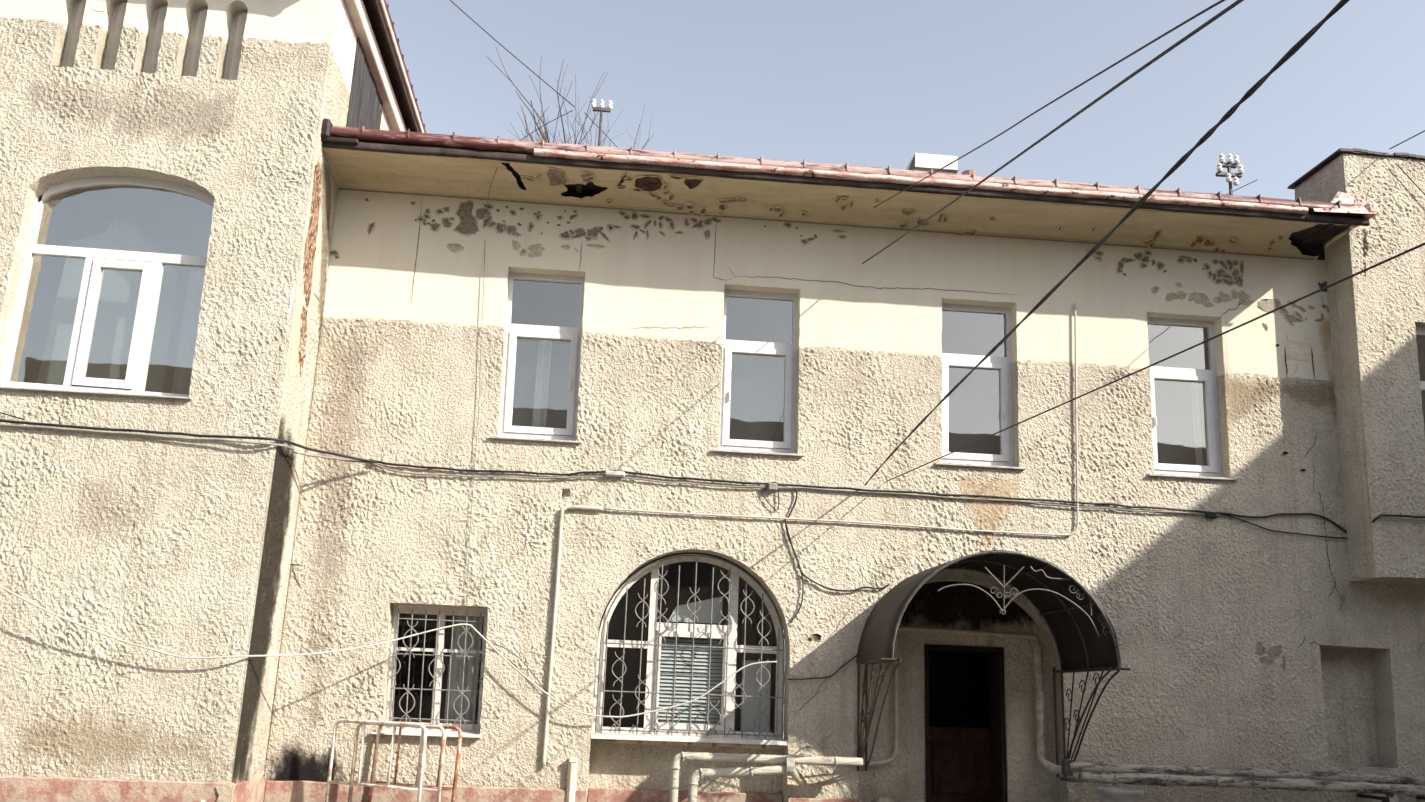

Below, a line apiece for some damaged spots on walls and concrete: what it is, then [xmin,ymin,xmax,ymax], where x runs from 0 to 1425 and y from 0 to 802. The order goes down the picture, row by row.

peeling [520,167,596,186]
peeling [411,172,746,258]
peeling [764,205,848,246]
peeling [898,209,996,236]
spalling [298,160,340,377]
peeling [1086,250,1329,331]
damp [232,418,295,783]